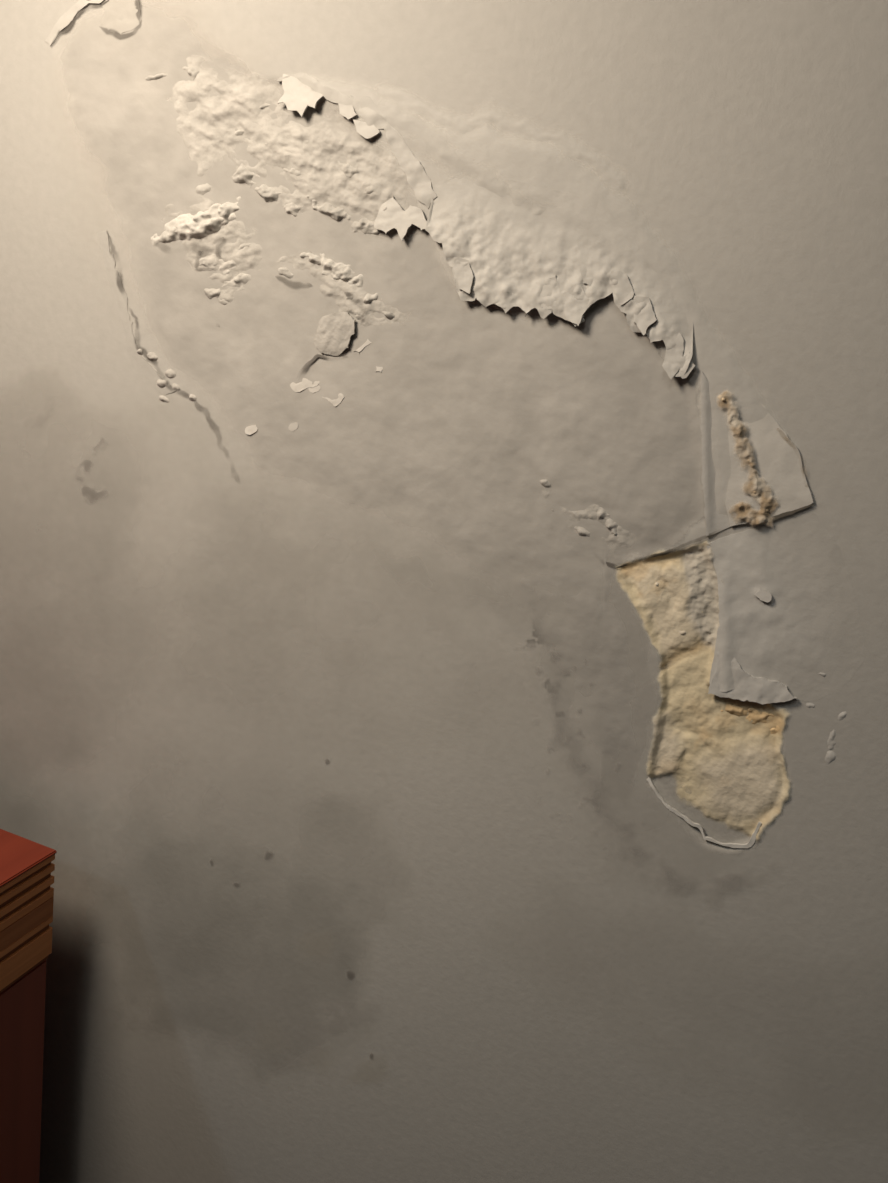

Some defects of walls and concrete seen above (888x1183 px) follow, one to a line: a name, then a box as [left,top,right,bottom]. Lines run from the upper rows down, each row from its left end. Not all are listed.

crack [94,231,197,403]
peeling [45,0,865,854]
leakage [0,434,149,843]
leakage [96,793,368,1070]